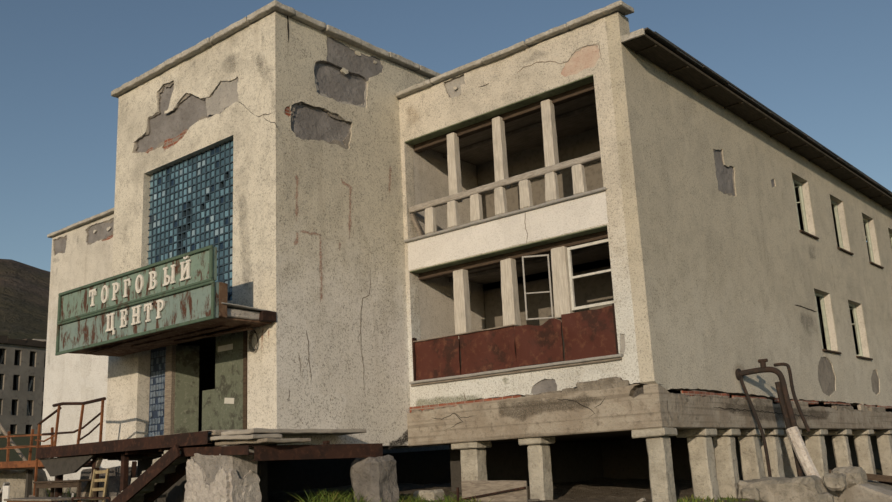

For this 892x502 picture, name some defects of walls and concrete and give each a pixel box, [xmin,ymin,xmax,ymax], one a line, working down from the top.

crack [517,43,605,73]
flaking render [133,75,239,154]
flaking render [284,36,383,149]
flaking render [713,149,735,196]
flaking render [86,218,114,245]
spalling [409,376,647,413]